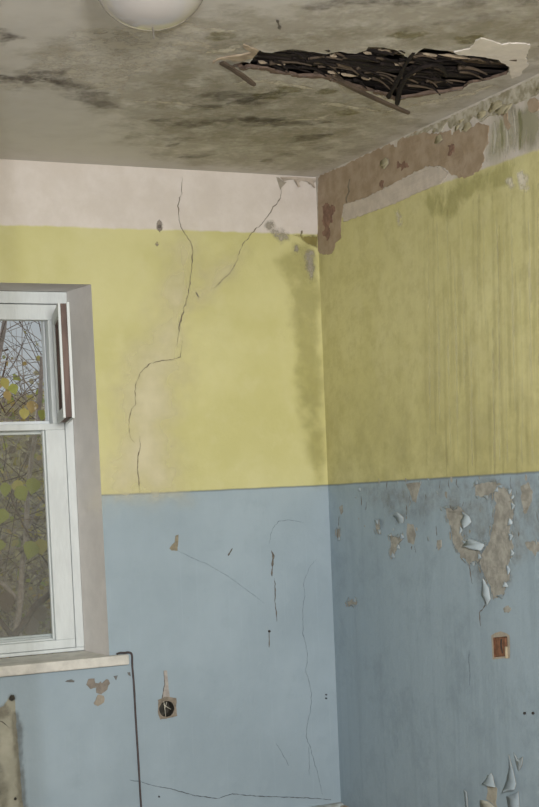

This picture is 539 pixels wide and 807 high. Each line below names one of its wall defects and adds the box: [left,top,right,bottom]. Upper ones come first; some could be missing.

spalling [276,37,539,277]
crack [213,195,281,289]
leakage [300,235,317,246]
crack [129,186,193,490]
peeling [374,478,429,559]
peeling [427,474,539,626]
peeling [86,672,131,706]
crack [131,567,331,800]
peeling [480,754,523,807]